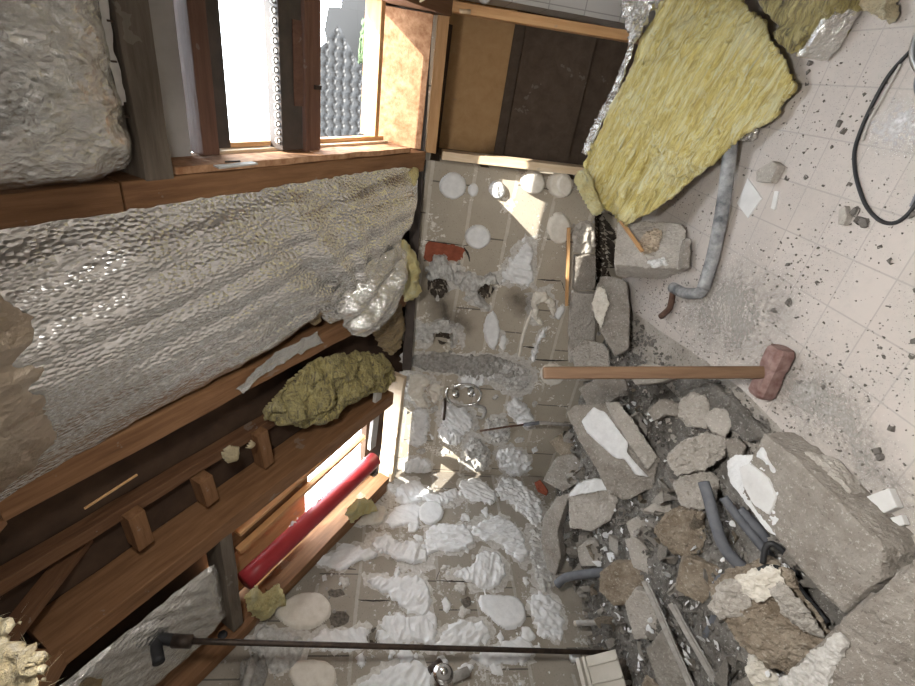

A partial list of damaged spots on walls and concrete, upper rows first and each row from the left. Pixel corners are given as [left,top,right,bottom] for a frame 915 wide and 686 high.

spalling [424,241,466,265]
spalling [571,214,616,287]
spalling [428,278,451,301]
spalling [478,279,505,299]
spalling [432,323,458,353]
peeling [408,523,423,542]
peeling [423,584,475,630]
peeling [481,630,504,646]
peeling [516,626,541,648]
peeling [388,641,418,663]
peeling [437,651,474,673]
peeling [490,663,503,676]